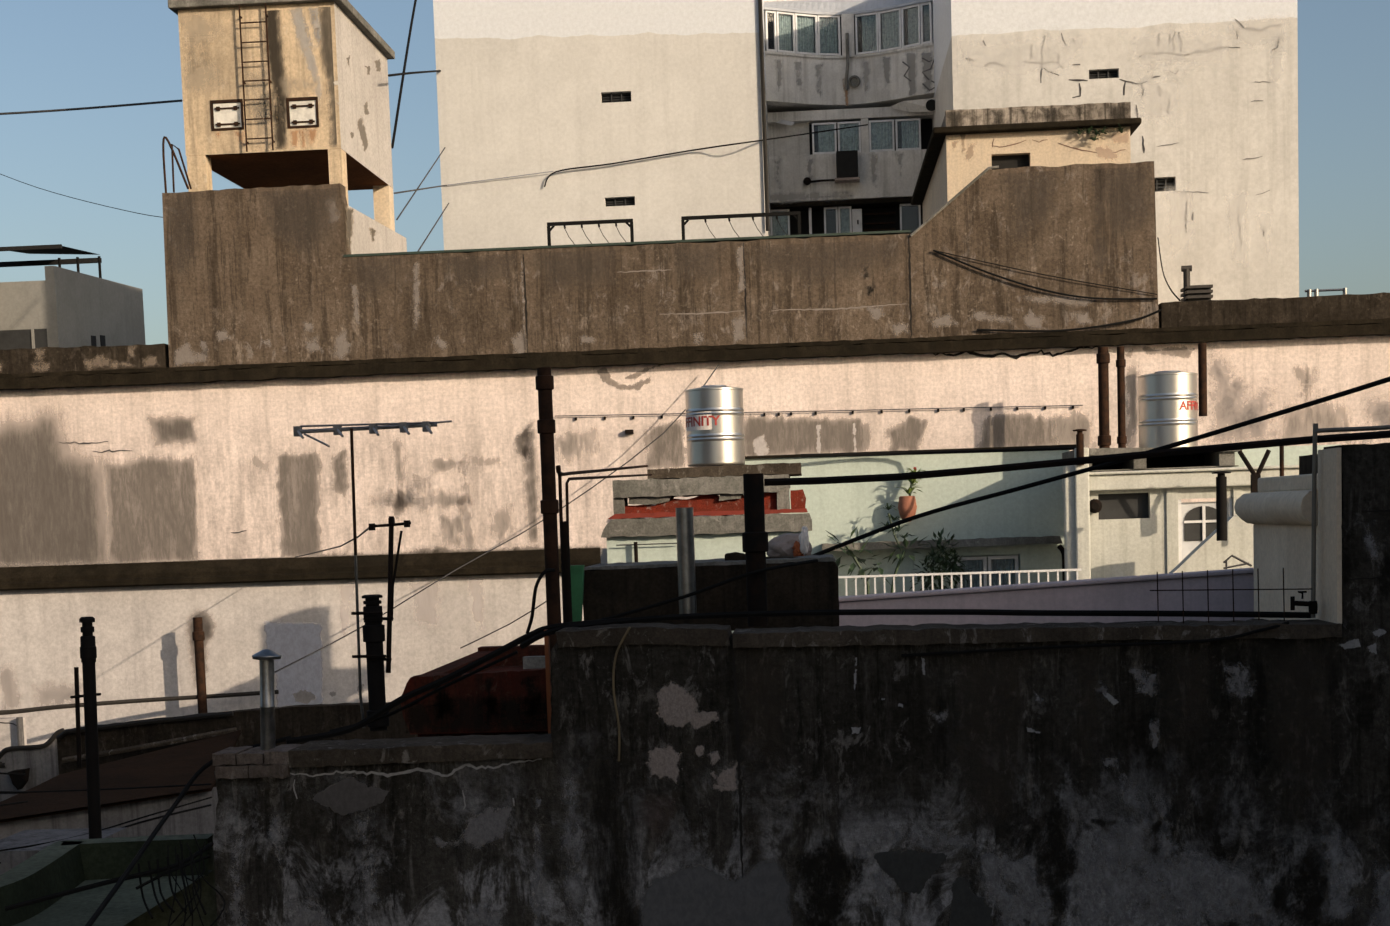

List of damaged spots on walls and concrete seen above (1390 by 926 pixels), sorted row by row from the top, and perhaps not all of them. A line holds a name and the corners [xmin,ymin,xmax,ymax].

crack [902,19,1282,153]
crack [1174,191,1207,234]
water stain [0,412,198,567]
water stain [253,422,601,559]
peeling [646,682,738,792]